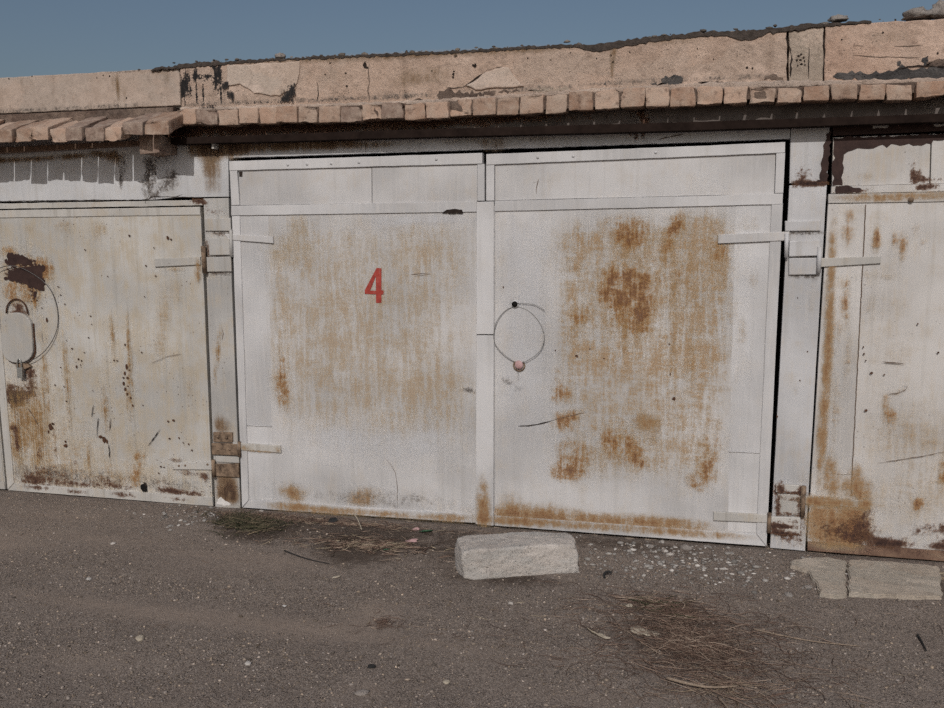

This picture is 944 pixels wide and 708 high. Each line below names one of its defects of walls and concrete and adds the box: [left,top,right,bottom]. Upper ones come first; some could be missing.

water stain [142,155,177,200]
corrosion [793,169,828,188]
peeling [817,124,944,193]
corrosion [851,163,944,201]
corrosion [3,246,53,316]
corrosion [552,215,729,489]
corrosion [275,358,289,405]
corrosion [771,211,944,550]
corrosion [6,356,141,498]
corrosion [158,458,239,504]
corrosion [277,485,464,522]
corrosion [476,484,730,538]